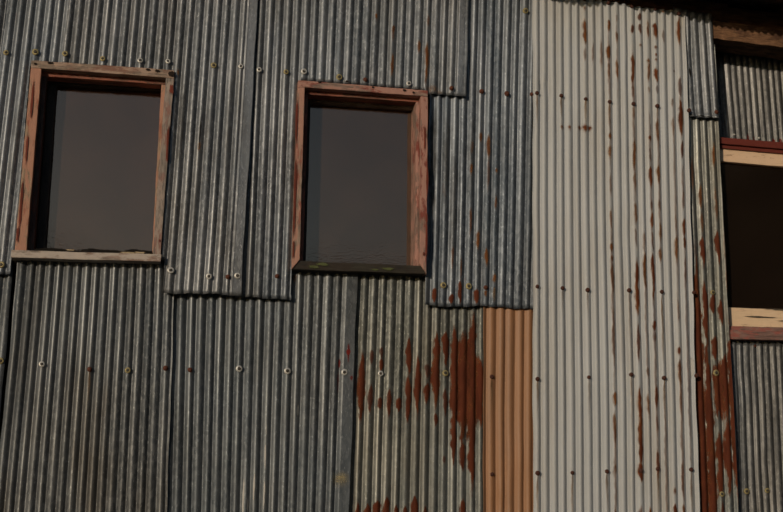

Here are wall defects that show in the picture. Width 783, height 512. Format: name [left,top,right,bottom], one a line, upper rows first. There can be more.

rust [631,13,658,82]
rust [635,213,663,330]
rust [675,218,686,258]
rust [691,186,738,512]
rust [357,314,492,487]
rust [638,380,665,481]
rust [355,496,427,512]